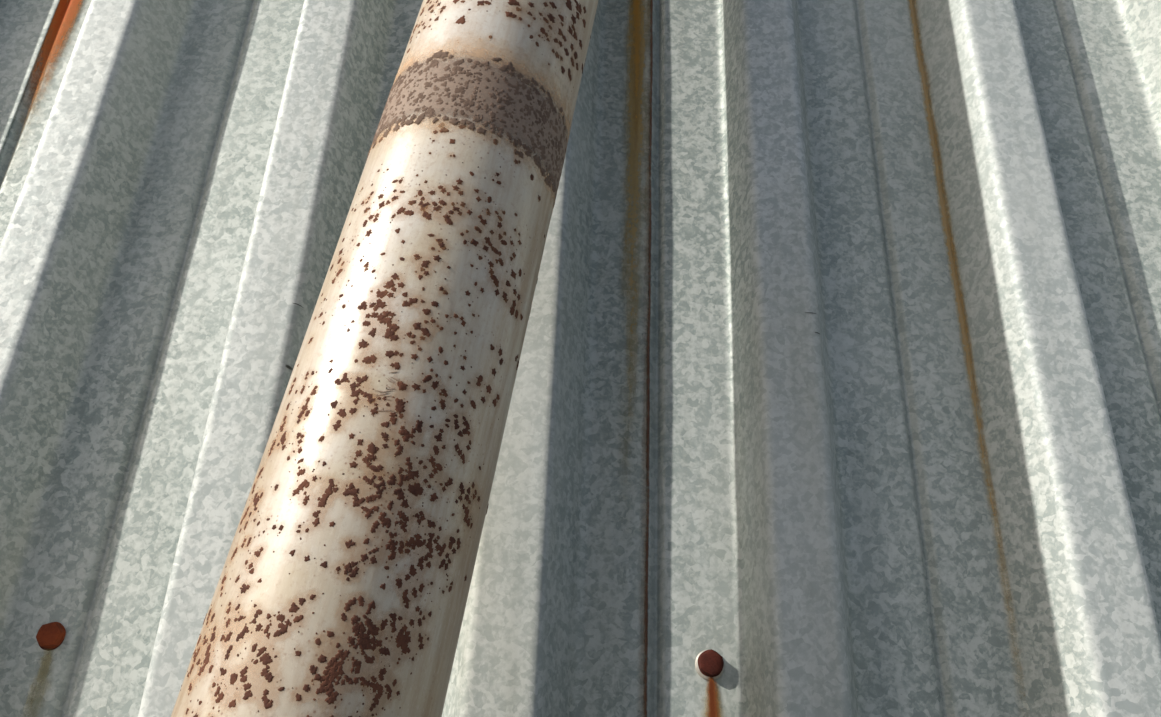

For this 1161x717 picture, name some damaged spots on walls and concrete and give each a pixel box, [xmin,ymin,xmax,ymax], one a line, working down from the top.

rust [32,0,82,95]
rust [180,0,569,717]
rust [505,0,591,92]
rust [625,0,653,717]
rust [908,0,1009,608]
rust [705,677,721,717]